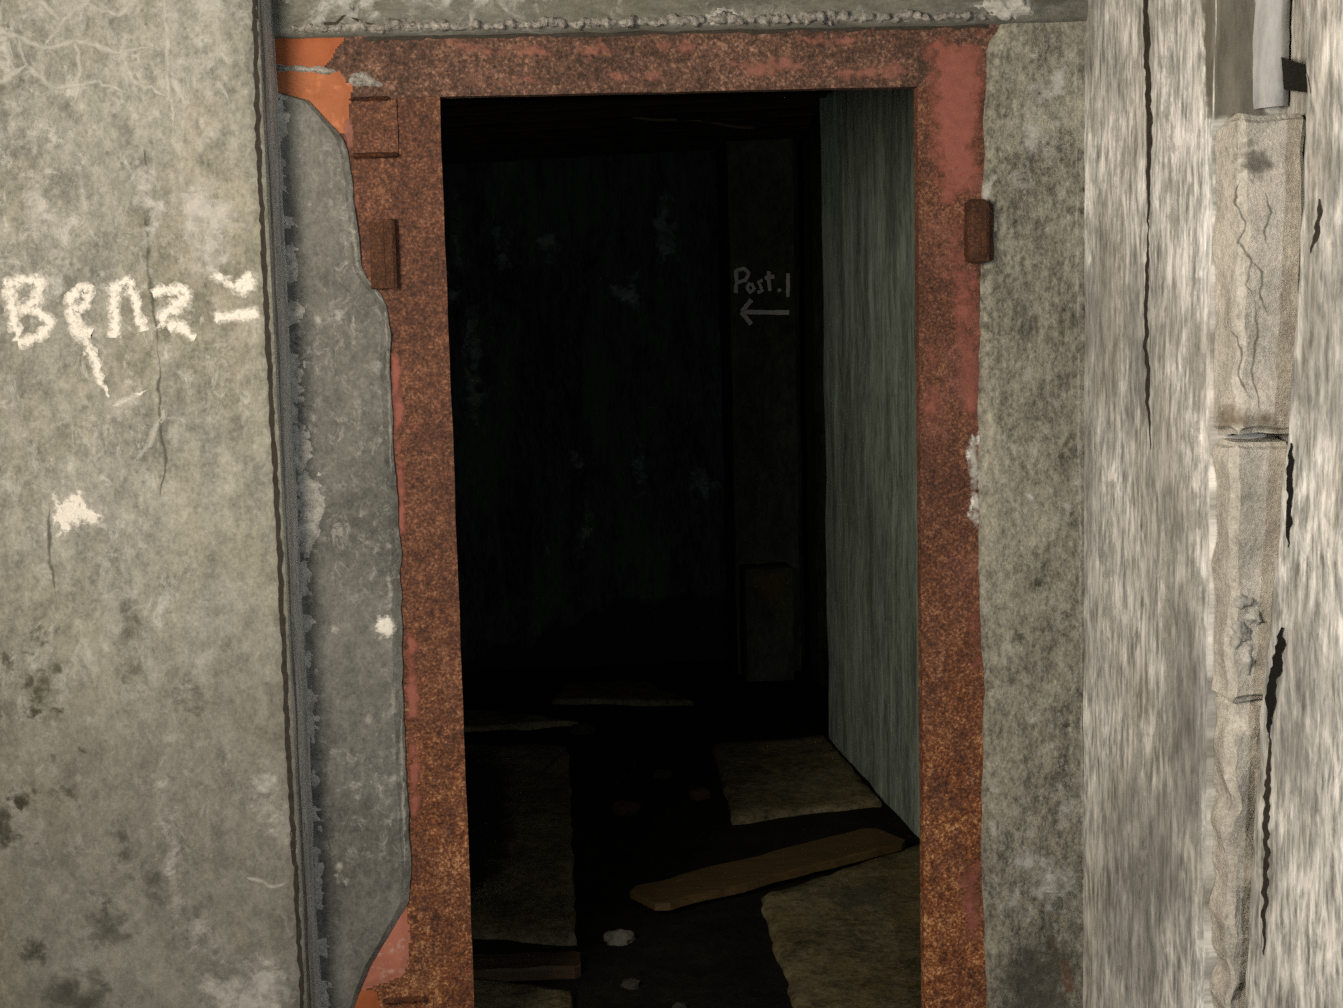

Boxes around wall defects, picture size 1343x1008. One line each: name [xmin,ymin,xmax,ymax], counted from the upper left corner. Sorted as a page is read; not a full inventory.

spalling [275,37,383,146]
efflorescence [23,172,65,238]
efflorescence [132,167,164,243]
efflorescence [182,182,237,272]
water stain [0,791,34,847]
efflorescence [199,958,286,1008]
spalling [354,906,410,1008]